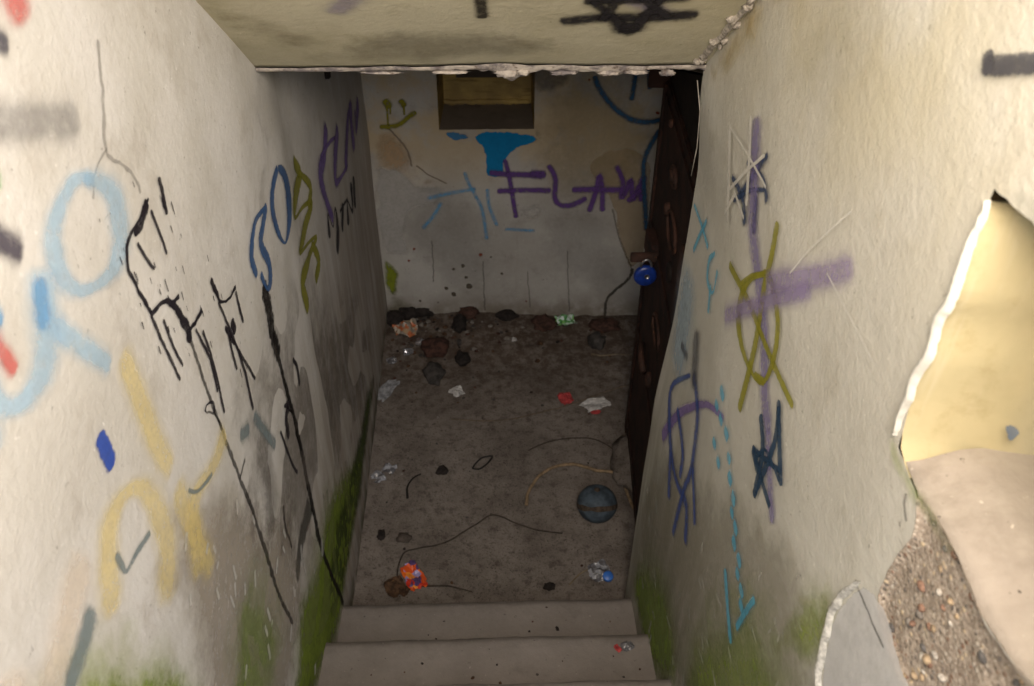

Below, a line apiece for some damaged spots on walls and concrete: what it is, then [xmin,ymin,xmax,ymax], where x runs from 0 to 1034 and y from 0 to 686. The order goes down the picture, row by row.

spalling [255,0,756,81]
spalling [892,189,1008,436]
spalling [814,497,1034,686]